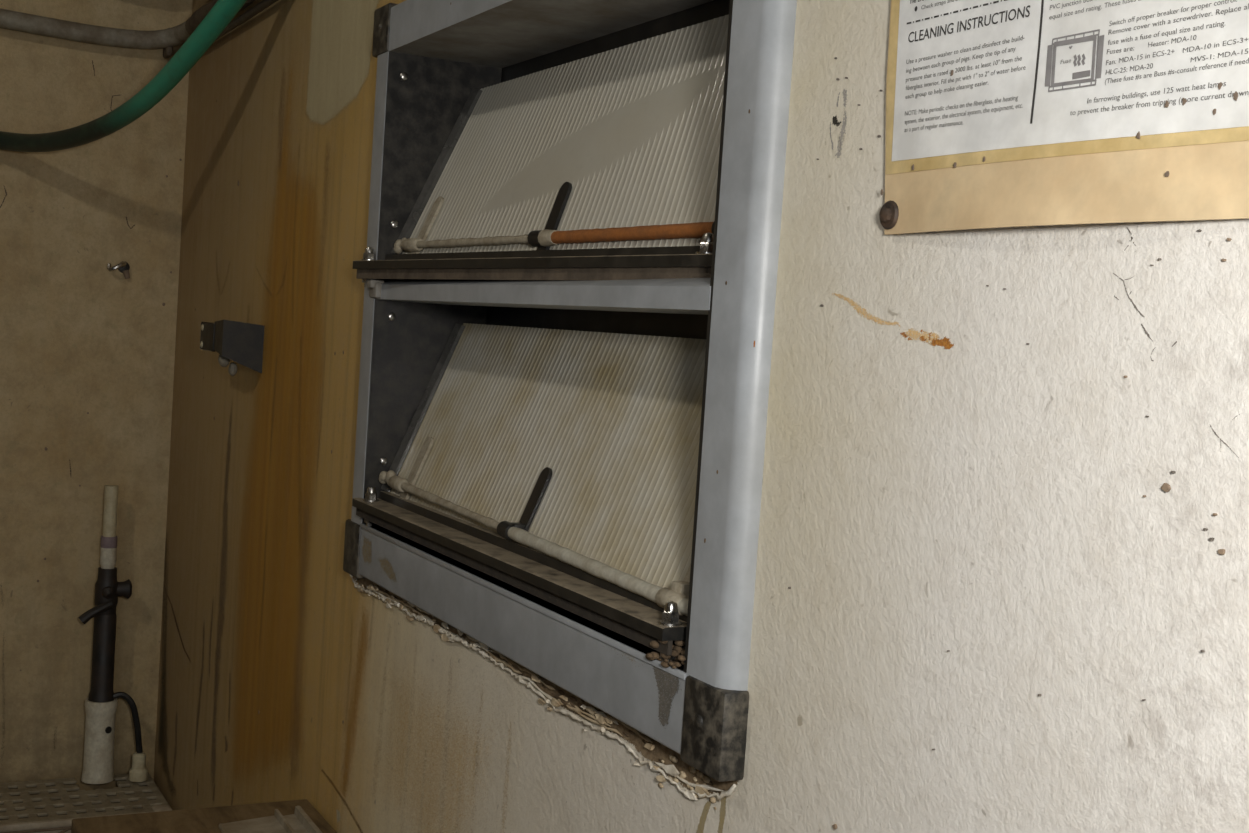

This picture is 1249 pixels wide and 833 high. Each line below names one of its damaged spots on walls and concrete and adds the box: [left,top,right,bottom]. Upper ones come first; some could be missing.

rust [832,293,954,349]
damp [156,518,178,796]
damp [194,405,233,802]
spalling [350,575,738,810]
damp [696,796,726,833]